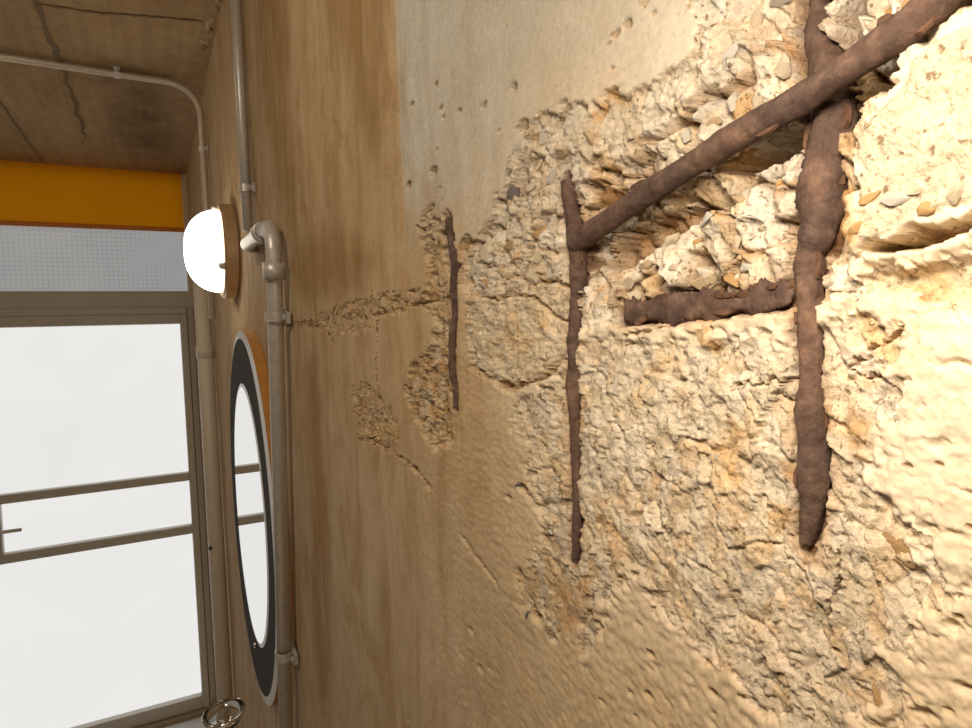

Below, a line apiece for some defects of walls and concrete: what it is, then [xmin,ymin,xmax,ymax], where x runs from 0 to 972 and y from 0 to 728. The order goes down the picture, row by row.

crack [0,101,44,163]
crack [34,0,202,140]
spalling [349,381,400,454]
spalling [403,0,972,728]